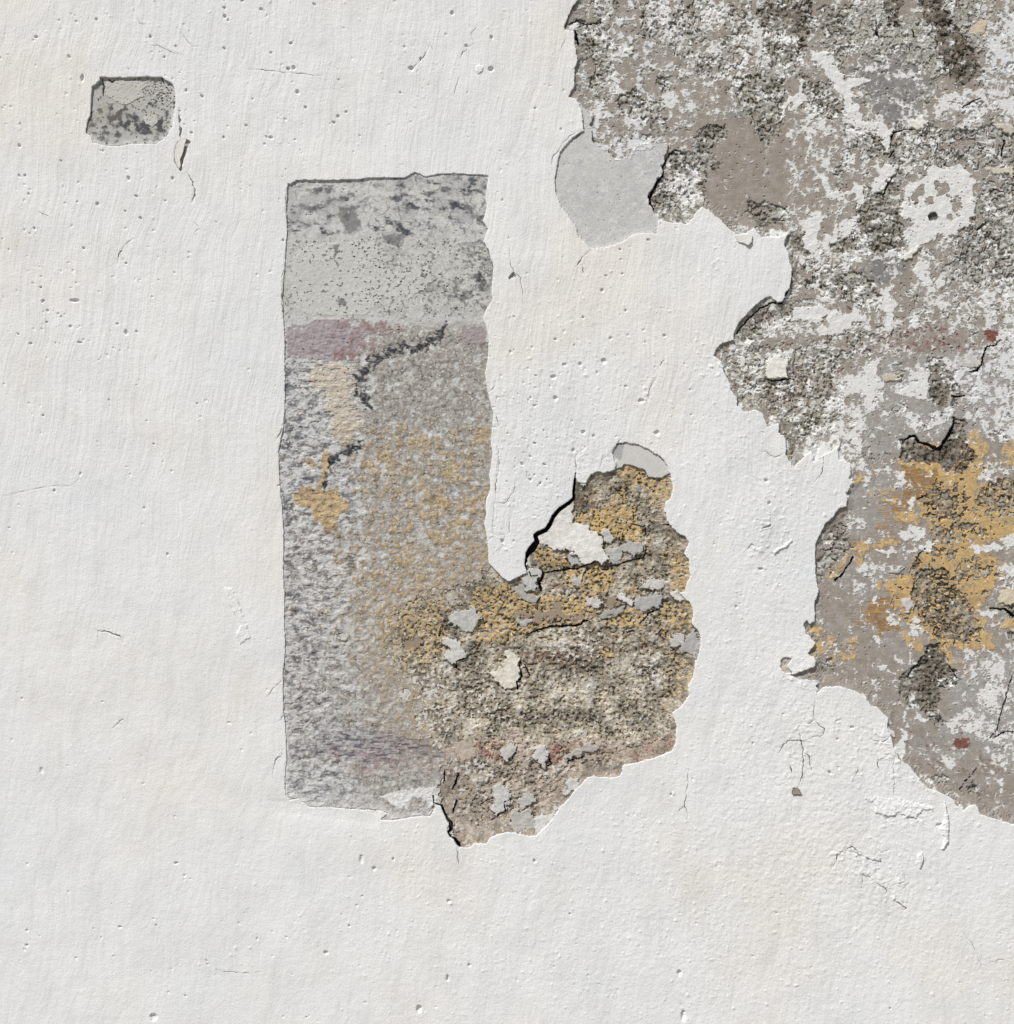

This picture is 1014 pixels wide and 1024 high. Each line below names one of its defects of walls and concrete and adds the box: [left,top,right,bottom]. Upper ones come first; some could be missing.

peeling [86,77,191,171]
flaking render [555,0,1014,824]
crack [904,340,1000,451]
peeling [278,172,701,848]
crack [492,439,669,603]
crack [433,774,509,865]